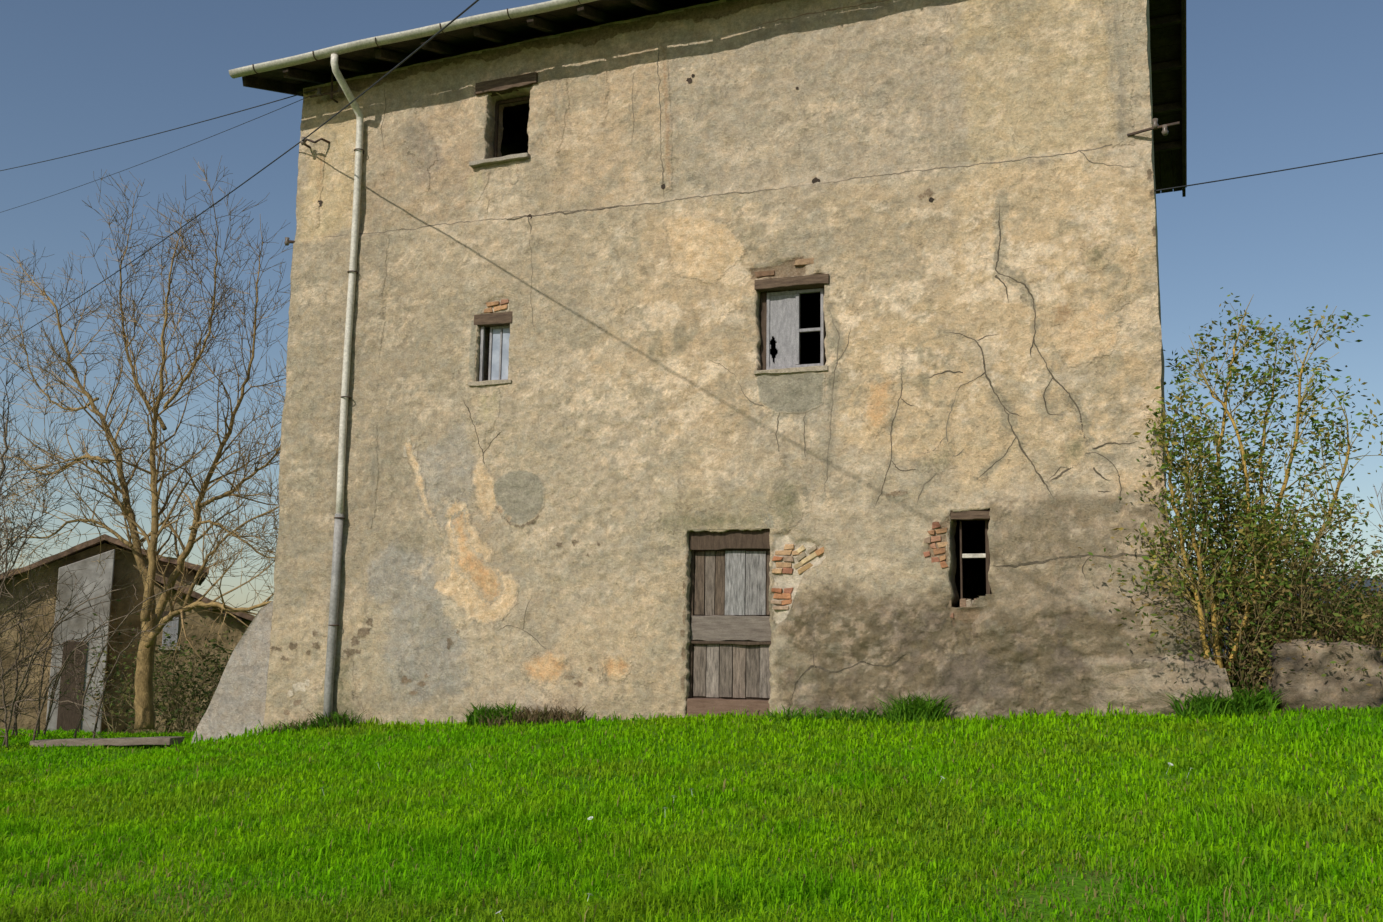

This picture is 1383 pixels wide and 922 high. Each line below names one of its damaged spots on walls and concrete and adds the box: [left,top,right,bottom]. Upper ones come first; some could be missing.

crack [320,43,1144,516]
peeling [402,439,521,650]
crack [495,506,539,529]
spalling [771,528,827,625]
spalling [923,514,950,568]
crack [996,553,1180,579]